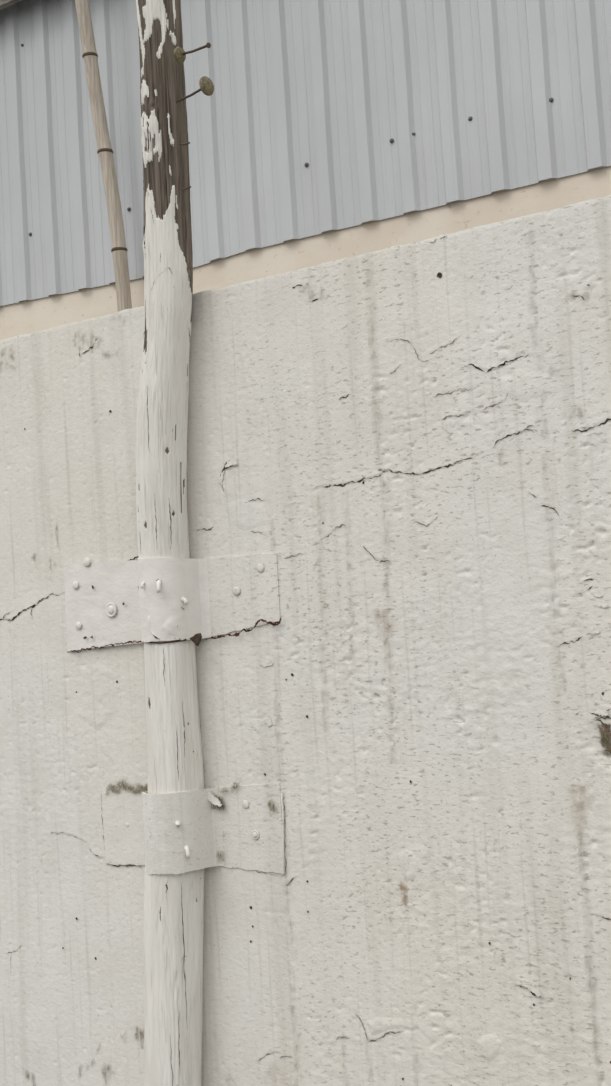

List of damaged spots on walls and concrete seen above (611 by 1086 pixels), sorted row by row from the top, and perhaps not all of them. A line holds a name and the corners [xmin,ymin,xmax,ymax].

peeling [136,0,176,175]
crack [434,354,529,429]
crack [317,425,533,488]
crack [0,592,65,621]
spalling [576,709,611,755]